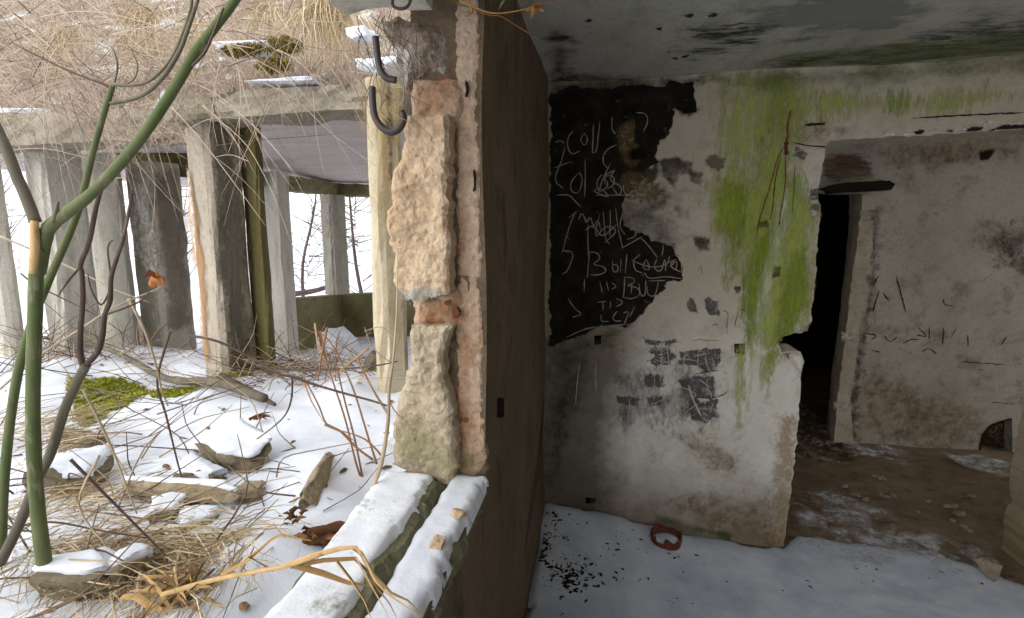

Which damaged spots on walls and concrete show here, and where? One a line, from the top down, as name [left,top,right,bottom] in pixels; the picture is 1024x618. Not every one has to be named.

damp [754,14,1024,91]
spalling [386,79,464,485]
peeling [545,78,700,455]
peeling [694,238,709,250]
damp [706,155,746,247]
damp [734,196,806,410]
corrosion [756,110,795,239]
peeling [616,336,728,432]